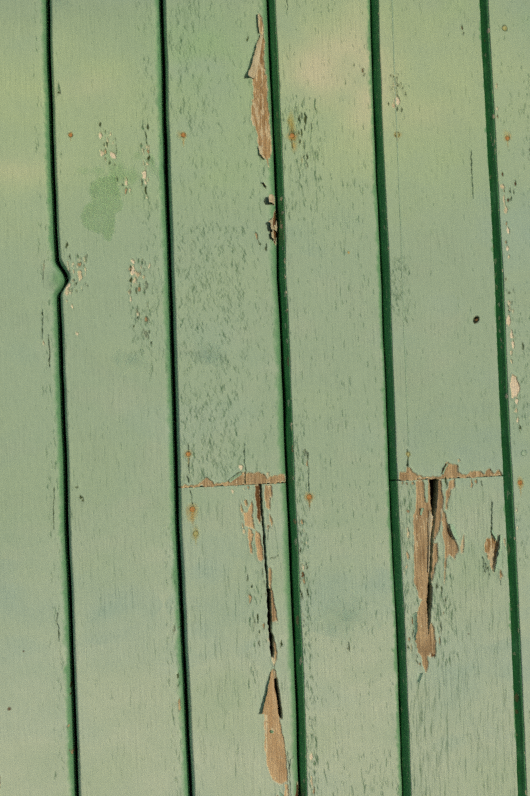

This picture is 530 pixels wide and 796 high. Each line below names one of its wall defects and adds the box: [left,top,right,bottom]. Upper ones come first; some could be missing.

peeling [246,14,271,164]
peeling [399,459,504,683]
peeling [483,529,510,578]
peeling [262,669,314,796]